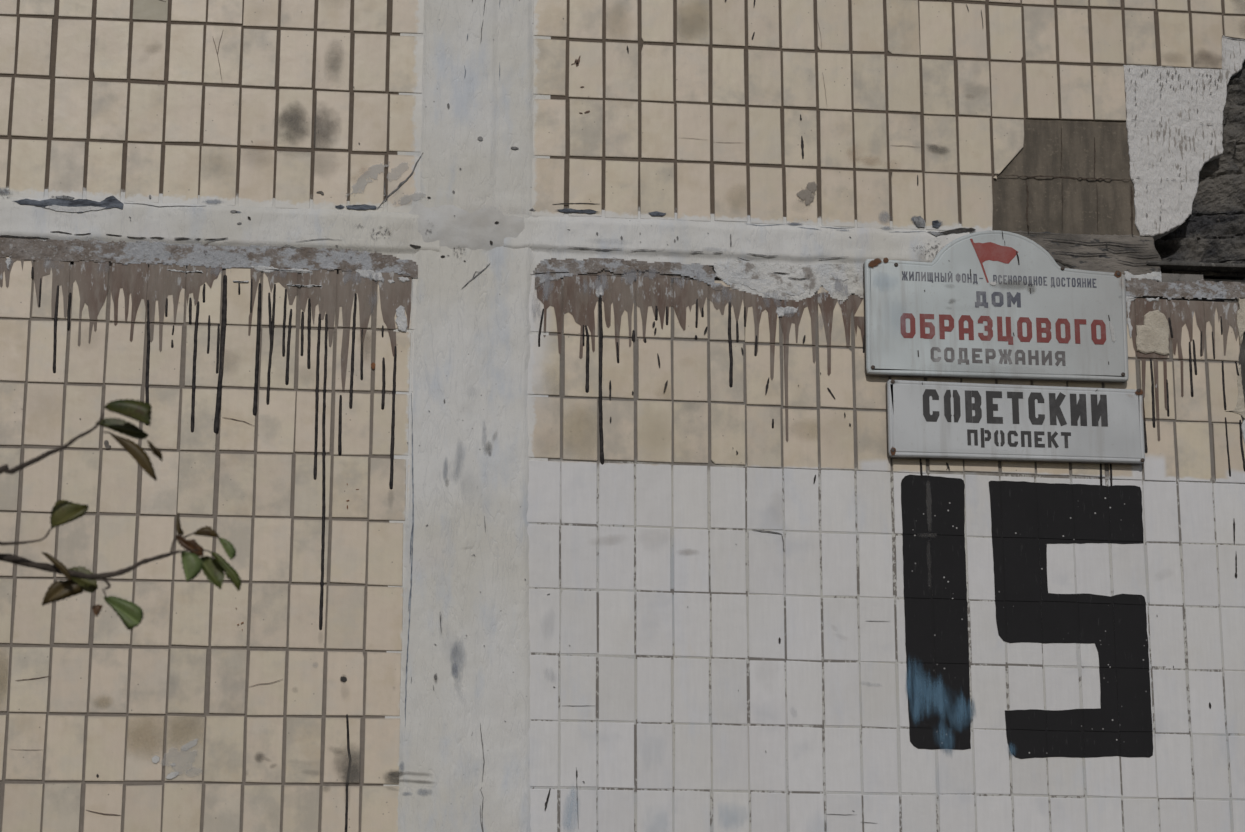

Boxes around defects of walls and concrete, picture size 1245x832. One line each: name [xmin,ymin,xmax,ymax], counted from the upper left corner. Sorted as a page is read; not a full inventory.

peeling [15,195,131,221]
peeling [0,237,421,288]
damp [31,267,411,630]
peeling [395,305,408,332]
damp [538,295,707,465]
damp [721,302,865,442]
peeling [914,216,976,236]
flaking render [992,35,1245,443]
damp [1132,316,1245,477]